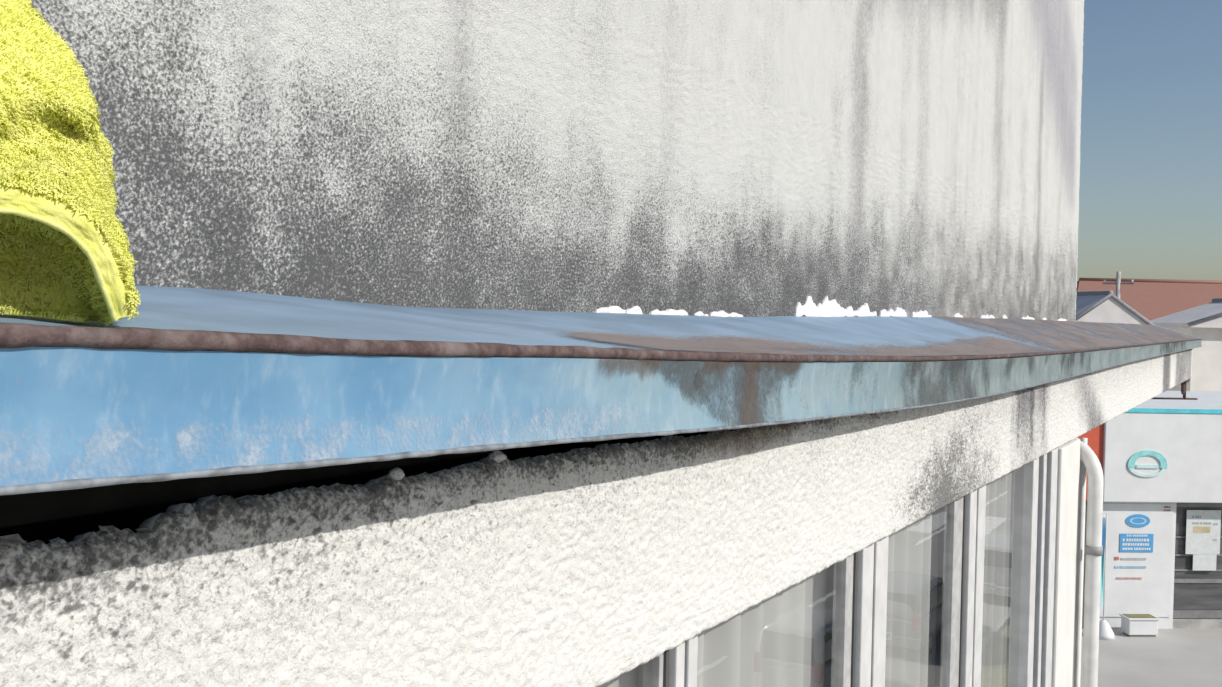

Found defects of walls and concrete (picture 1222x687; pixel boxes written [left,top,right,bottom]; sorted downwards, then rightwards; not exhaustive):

damp [28,0,1077,321]
damp [898,411,994,519]